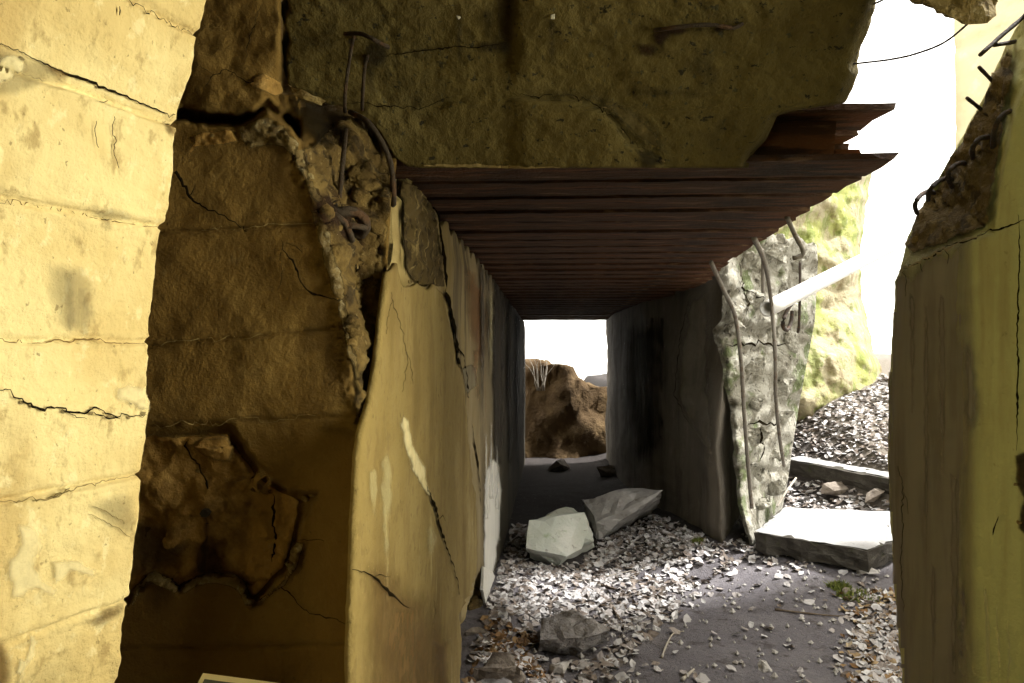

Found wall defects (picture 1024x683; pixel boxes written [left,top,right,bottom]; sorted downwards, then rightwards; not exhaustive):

crack [0,44,175,168]
crack [379,42,505,59]
spalling [899,50,1013,271]
crack [174,170,338,301]
crack [902,216,1021,451]
peeling [189,116,495,683]
spalling [129,434,315,606]
crack [352,569,409,608]
crack [426,485,459,589]